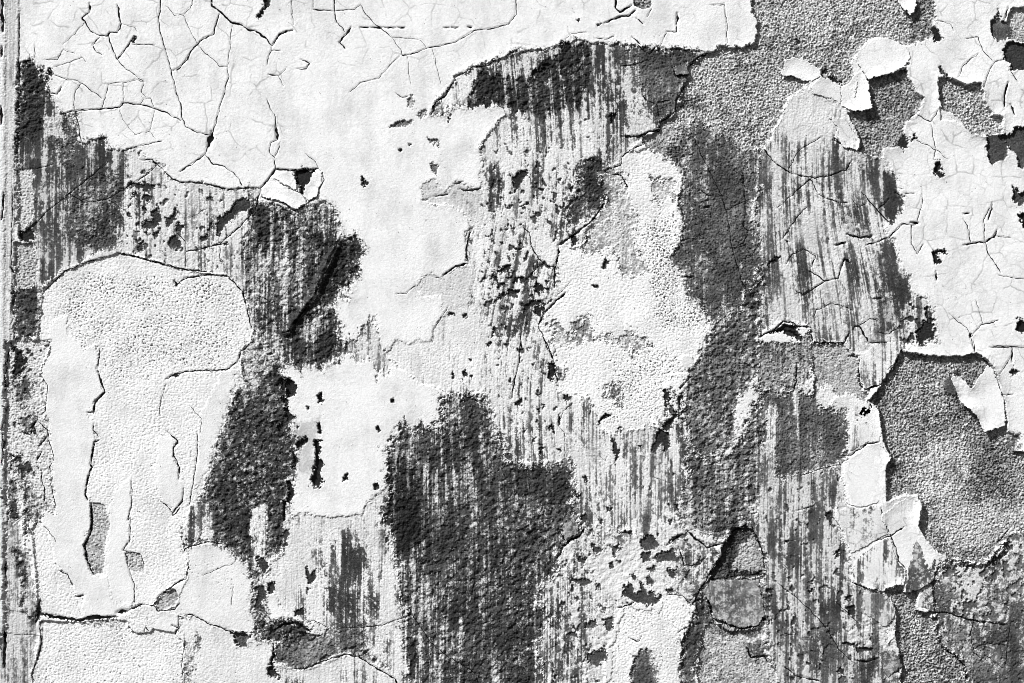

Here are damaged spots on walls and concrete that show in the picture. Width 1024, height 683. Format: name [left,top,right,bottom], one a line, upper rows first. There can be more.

peeling [11,58,396,683]
crack [1,350,478,683]
crack [0,0,679,414]
peeling [382,0,1024,683]
crack [512,53,923,682]
crack [908,109,944,157]
crack [934,20,1017,115]
crack [953,302,1024,411]
crack [964,204,1022,279]